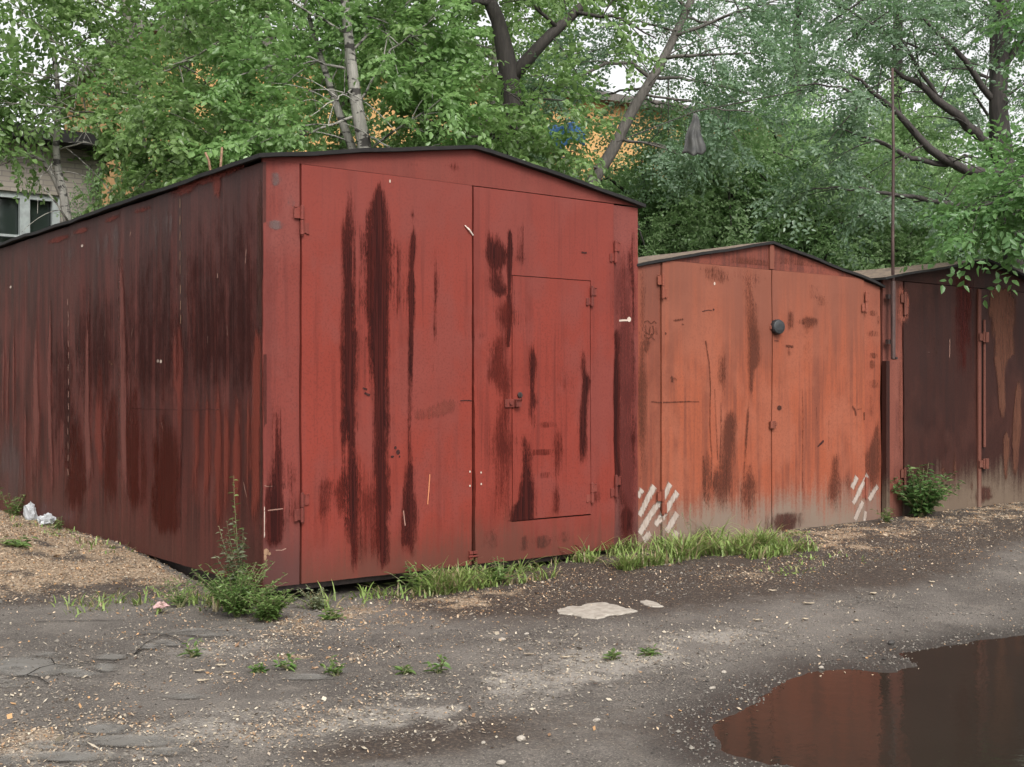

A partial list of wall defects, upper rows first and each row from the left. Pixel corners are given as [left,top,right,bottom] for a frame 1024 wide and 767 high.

rust [63,410,86,511]
rust [105,255,179,511]
rust [320,185,419,569]
rust [486,227,563,521]
rust [579,355,591,461]
rust [613,247,657,538]
rust [713,409,755,510]
rust [746,278,760,391]
rust [976,486,992,503]